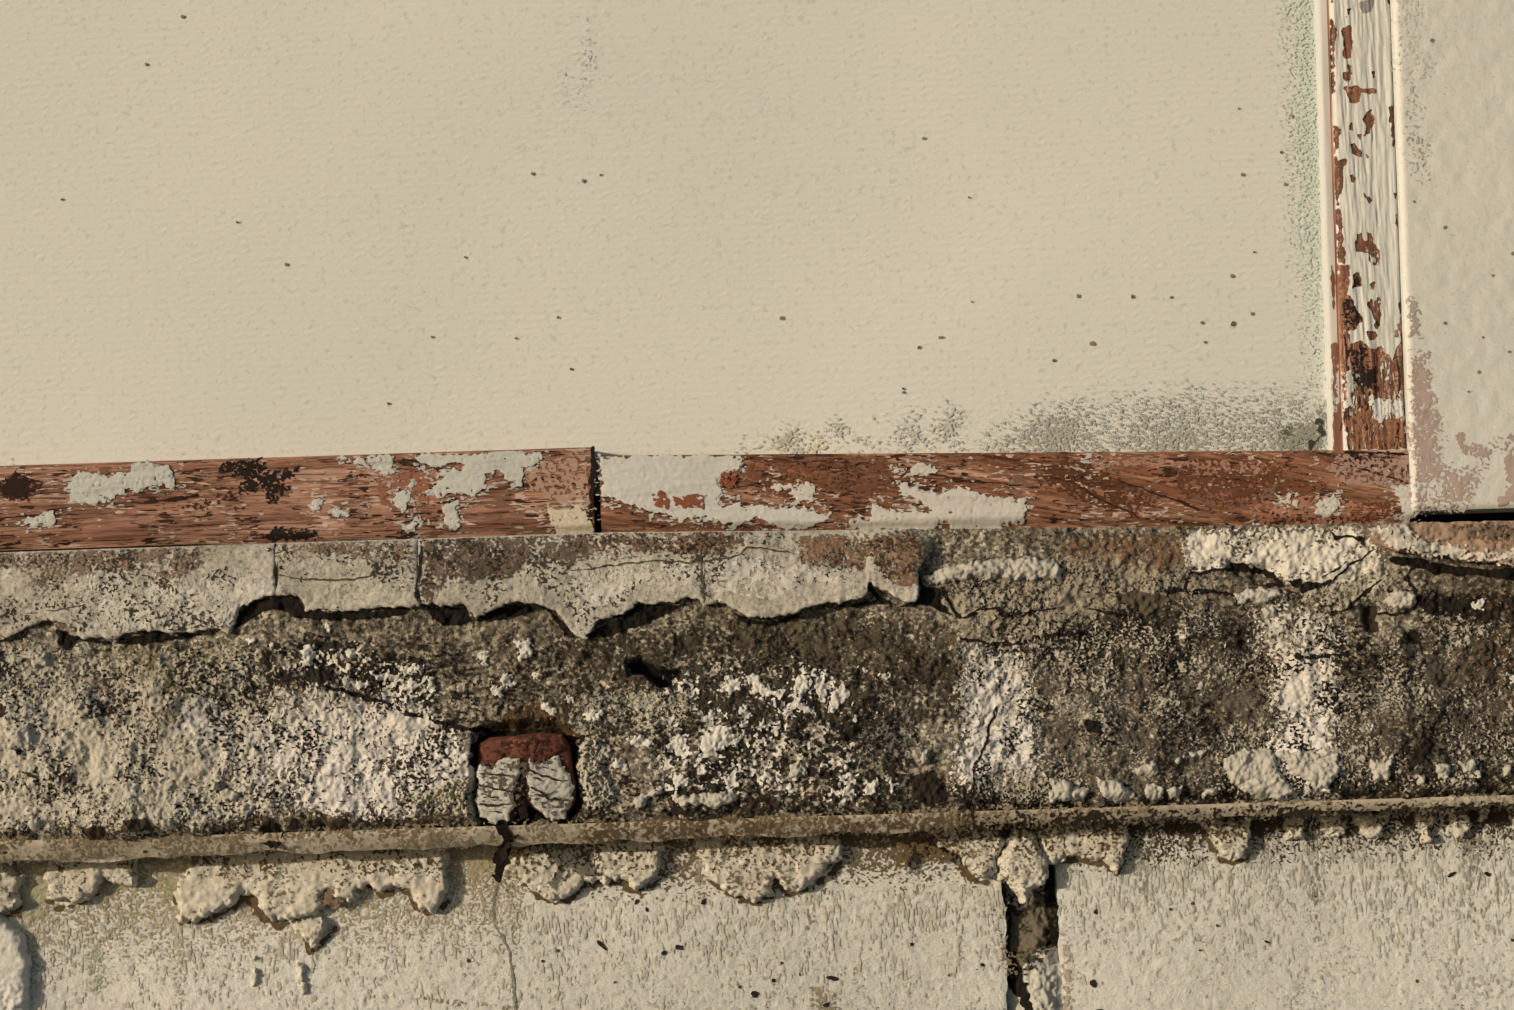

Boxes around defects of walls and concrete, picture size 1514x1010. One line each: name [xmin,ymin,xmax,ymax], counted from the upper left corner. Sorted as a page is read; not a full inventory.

peeling [1330,0,1514,518]
peeling [652,490,704,510]
peeling [278,537,533,602]
peeling [791,531,927,599]
spalling [1229,562,1302,588]
crack [1299,532,1514,616]
crack [1302,652,1351,660]
damp [176,697,224,731]
damp [836,704,917,767]
crack [325,684,587,1010]
damp [0,734,1514,1010]
crack [1001,865,1059,1010]